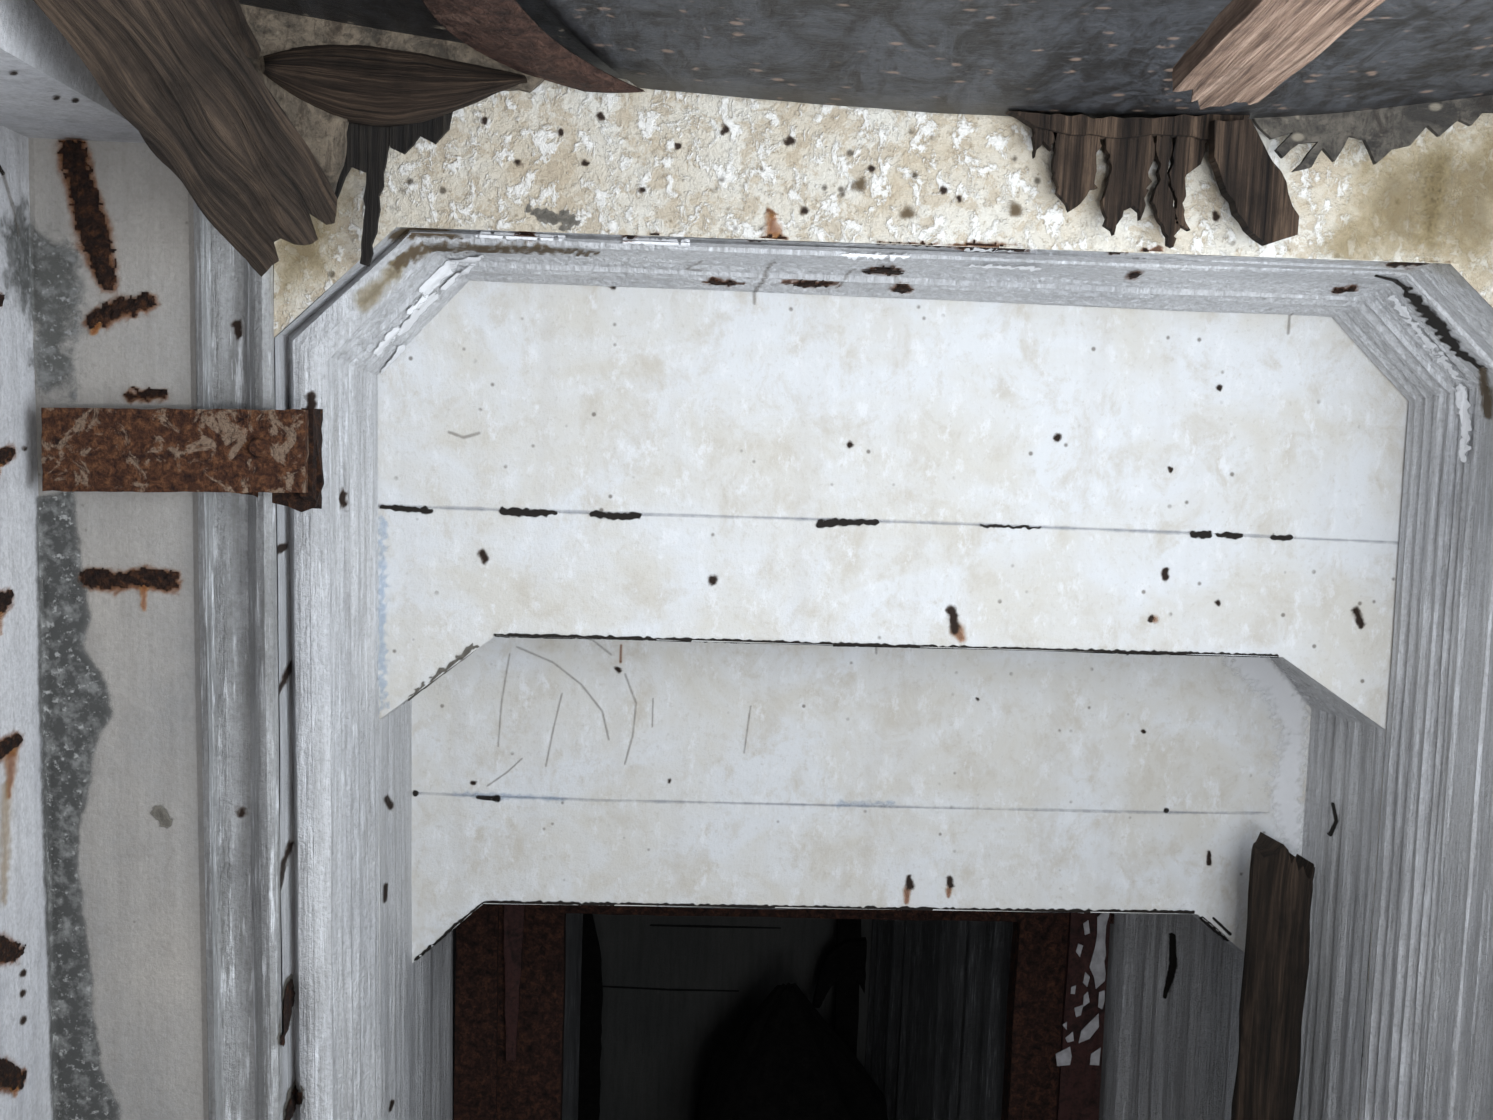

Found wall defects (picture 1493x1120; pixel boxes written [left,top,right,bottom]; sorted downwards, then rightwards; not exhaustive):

spalling [851,165,875,192]
spalling [901,207,915,218]
spalling [1010,203,1022,216]
water stain [1335,141,1493,256]
rust [57,139,157,335]
rust [0,589,14,635]
rust [0,732,23,799]
peeling [1056,913,1109,1066]
rust [0,1058,27,1097]